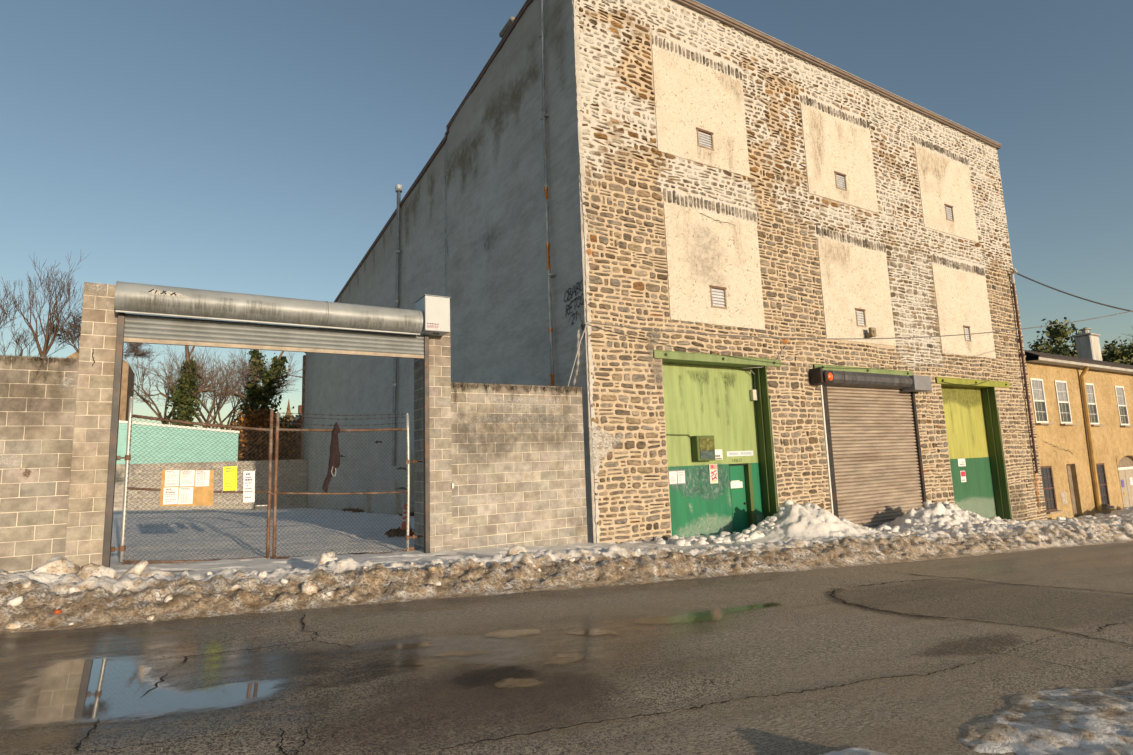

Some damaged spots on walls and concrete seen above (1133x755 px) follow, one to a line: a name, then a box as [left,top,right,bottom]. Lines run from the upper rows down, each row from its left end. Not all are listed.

crack [141,614,356,697]
crack [407,571,1133,755]
crack [75,719,309,755]